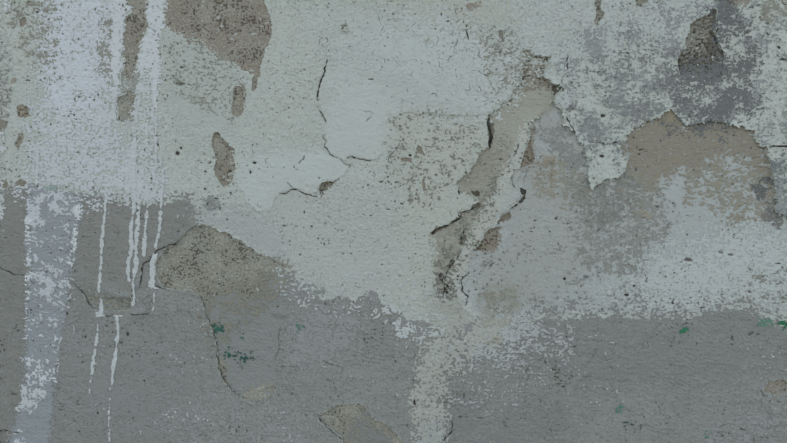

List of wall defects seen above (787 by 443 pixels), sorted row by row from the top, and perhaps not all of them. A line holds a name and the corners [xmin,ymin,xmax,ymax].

flaking render [163,0,272,117]
peeling [156,224,293,407]
crack [241,38,414,203]
crack [348,4,509,149]
crack [416,190,483,306]
flaking render [212,25,787,327]
crack [509,319,649,405]
peeling [677,0,749,81]